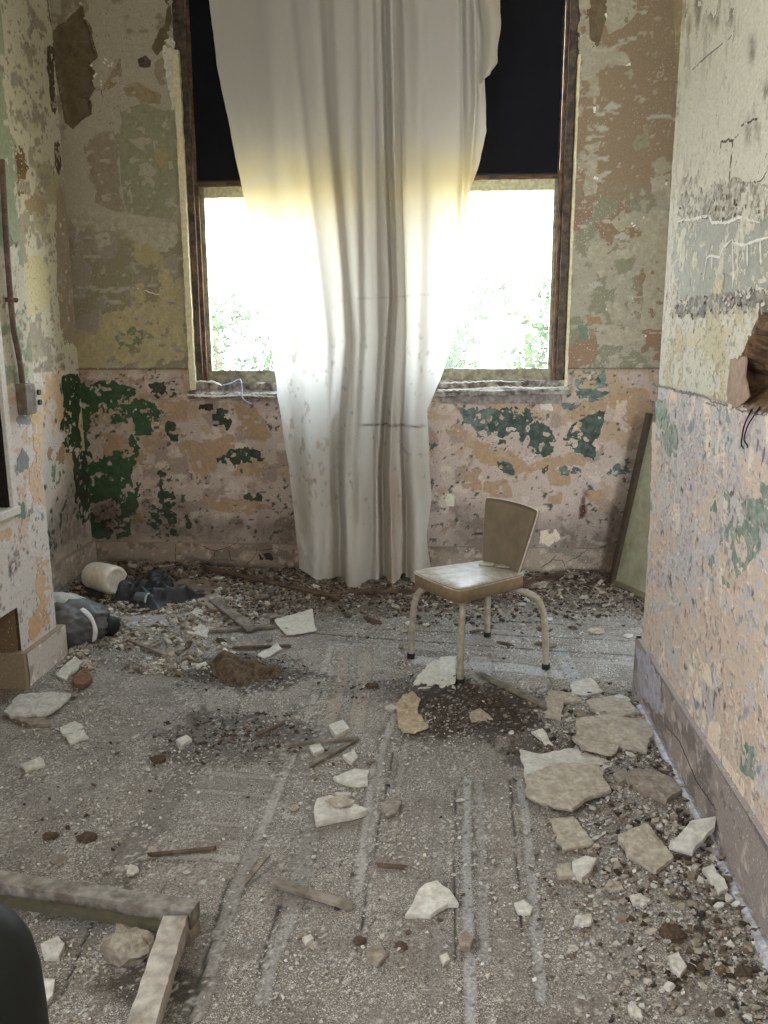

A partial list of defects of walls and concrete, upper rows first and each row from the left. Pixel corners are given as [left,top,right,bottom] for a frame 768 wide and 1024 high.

peeling [47,0,179,221]
peeling [583,140,601,196]
peeling [577,0,639,114]
peeling [650,174,671,198]
crack [692,31,734,70]
crack [720,118,768,184]
peeling [0,81,274,542]
peeling [438,210,768,646]
peeling [28,529,55,641]
peeling [636,646,664,715]